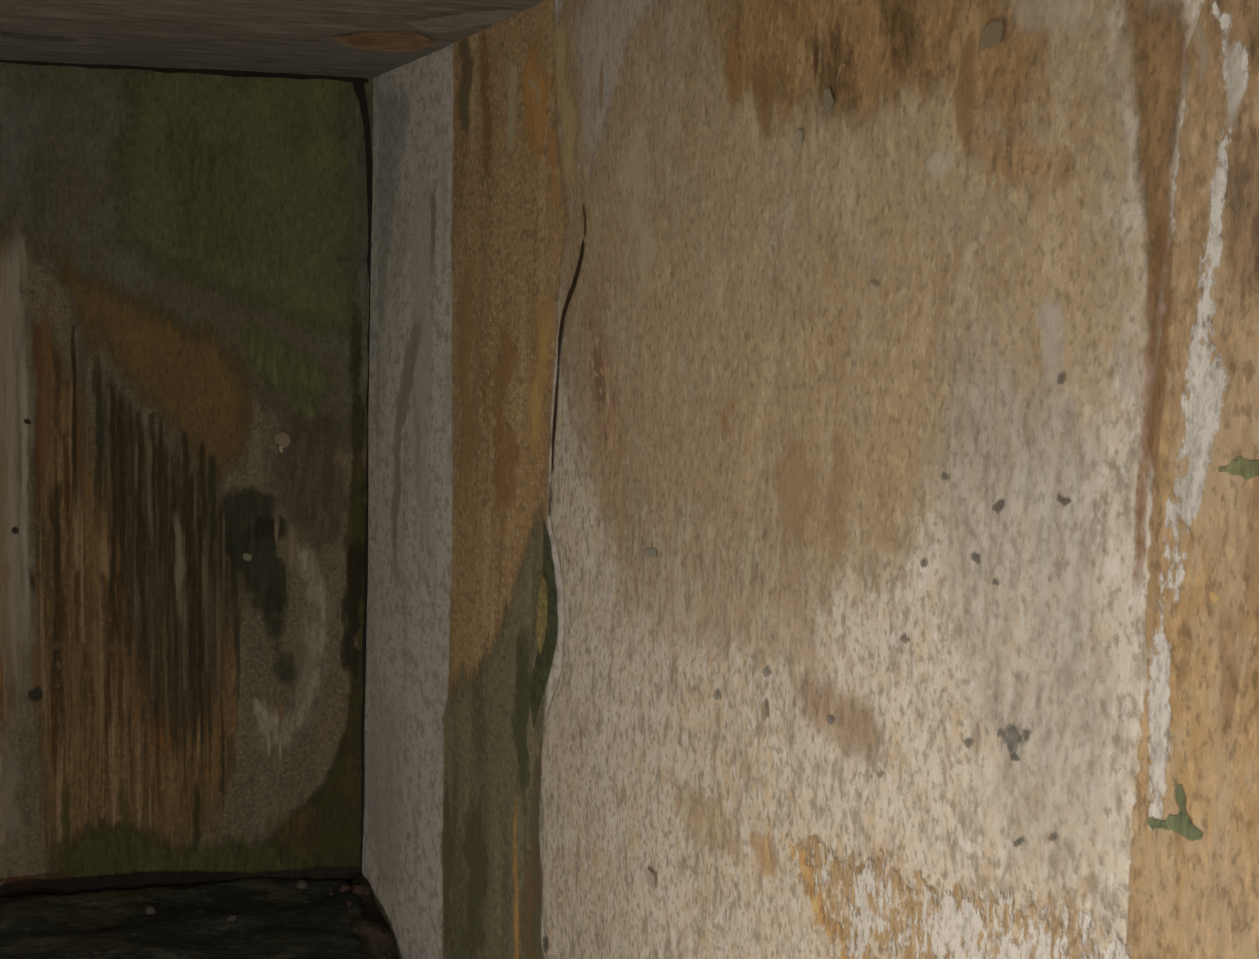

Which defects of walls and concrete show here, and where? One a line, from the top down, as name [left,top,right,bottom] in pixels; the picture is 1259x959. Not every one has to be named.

damp [0,62,407,746]
crack [548,206,586,516]
spalling [1127,0,1259,959]
damp [1148,2,1249,830]
damp [441,790,488,948]
damp [513,637,547,959]
peeling [785,822,1101,959]